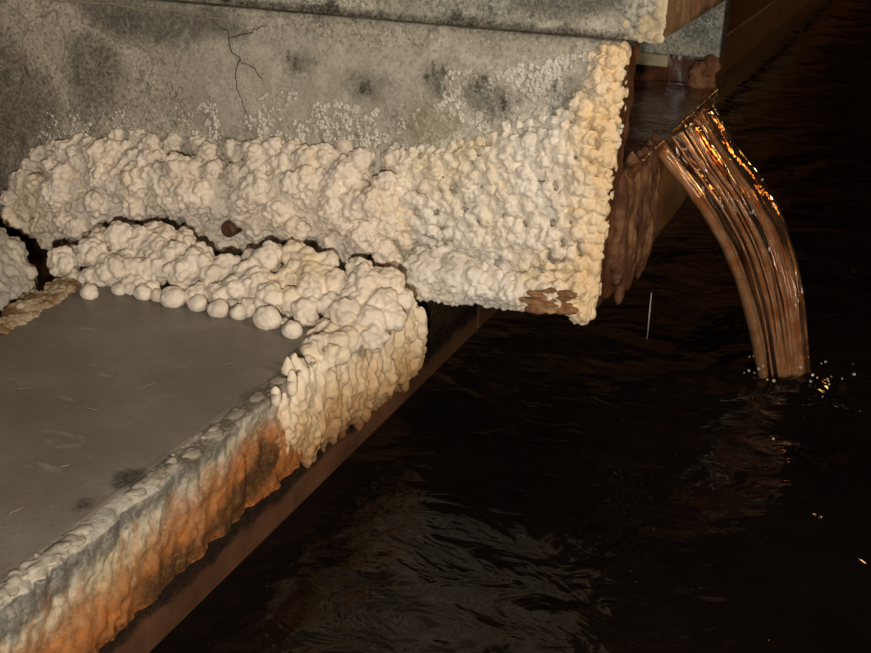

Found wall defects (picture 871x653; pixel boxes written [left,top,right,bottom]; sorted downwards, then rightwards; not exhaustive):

crack [204,16,265,113]
water stain [622,0,731,88]
water stain [0,6,661,653]
rust [24,419,319,653]